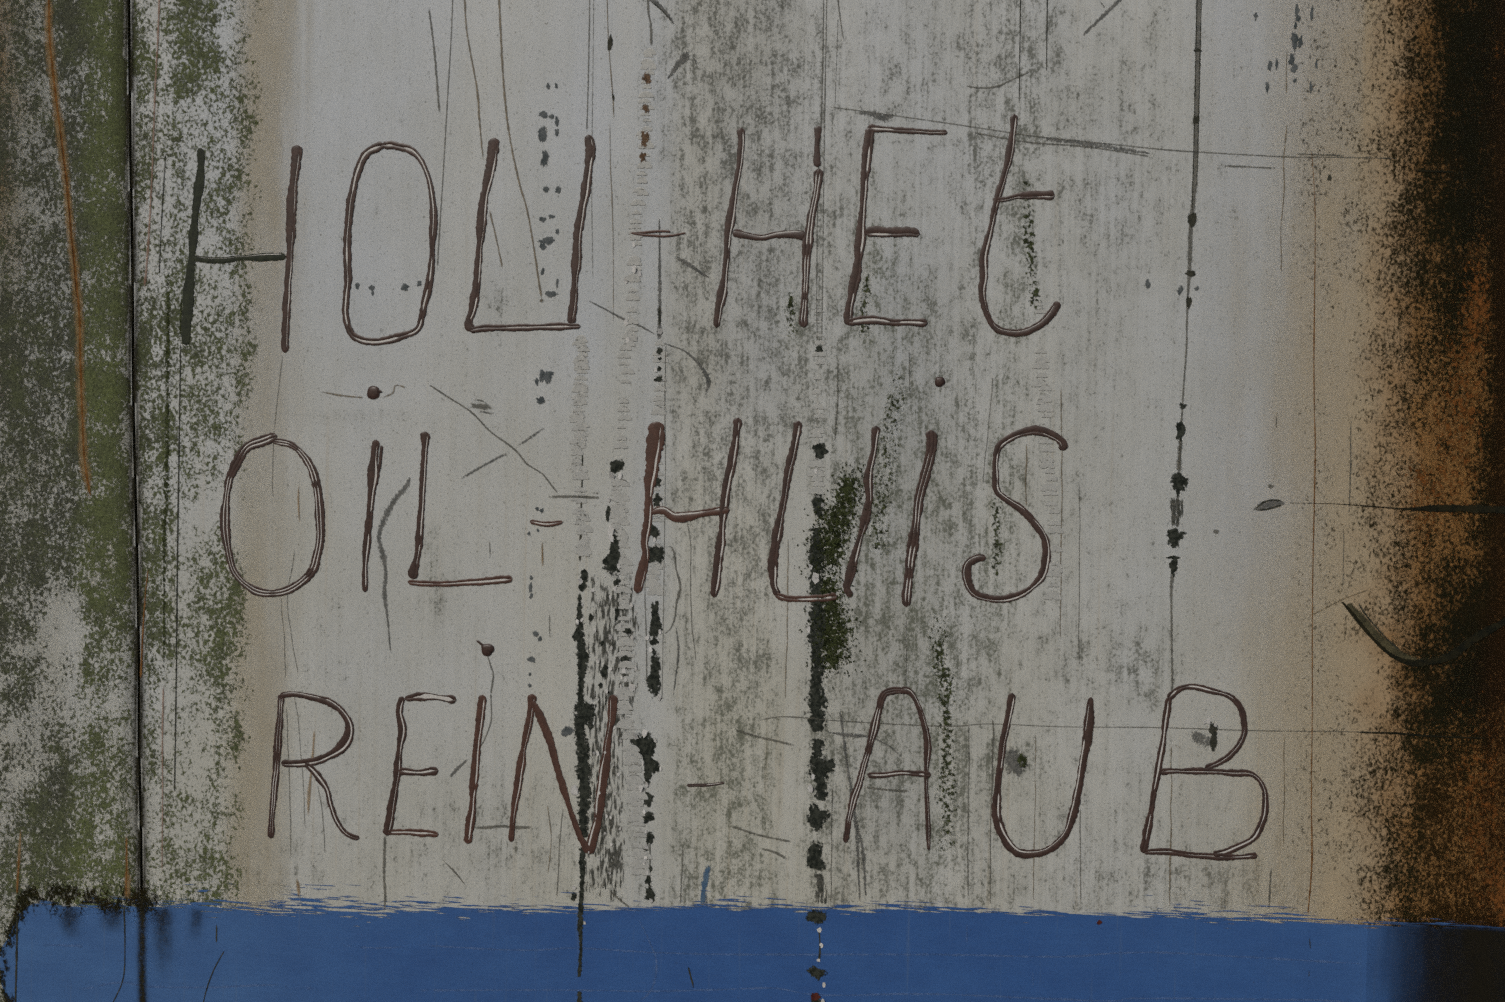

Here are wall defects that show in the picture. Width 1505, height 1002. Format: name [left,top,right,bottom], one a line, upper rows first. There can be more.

rust [45,0,90,494]
damp [140,153,182,867]
crack [1166,0,1202,691]
rust [1285,0,1505,934]